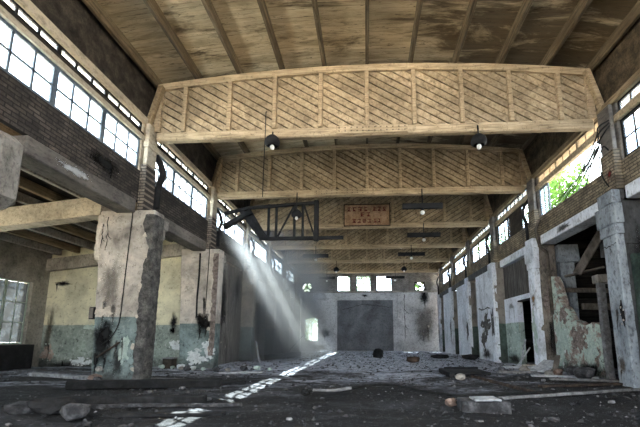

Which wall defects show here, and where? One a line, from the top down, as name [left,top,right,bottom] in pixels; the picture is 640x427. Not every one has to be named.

leakage [90,152,118,179]
leakage [53,338,123,373]
spalling [118,214,165,379]
spalling [186,253,219,366]
leakage [418,312,433,338]
peeling [480,309,495,352]
peeling [554,304,599,368]